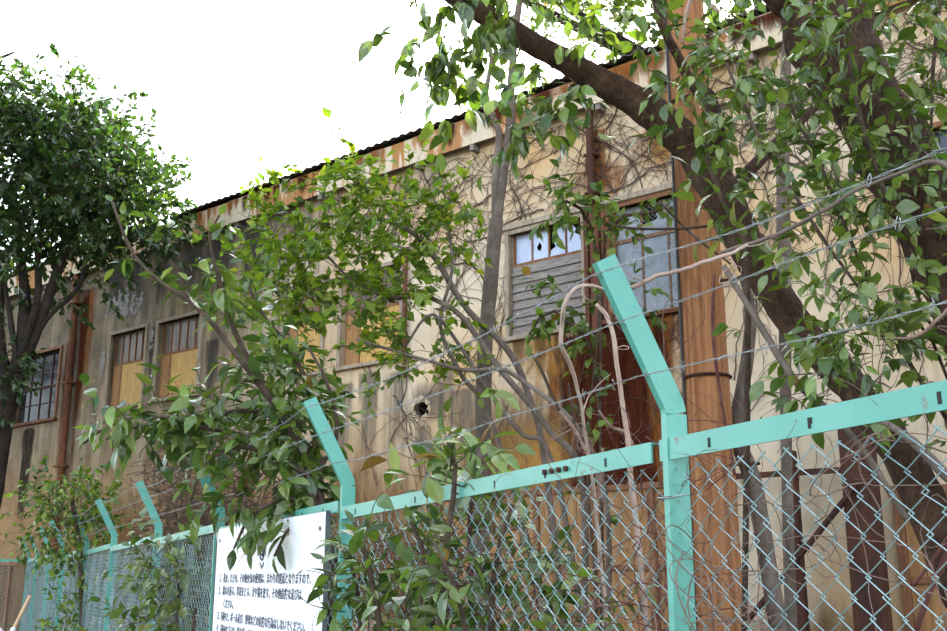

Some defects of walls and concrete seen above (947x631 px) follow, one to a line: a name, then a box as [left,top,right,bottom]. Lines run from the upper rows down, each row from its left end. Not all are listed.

peeling [105,287,145,323]
spalling [412,388,442,422]